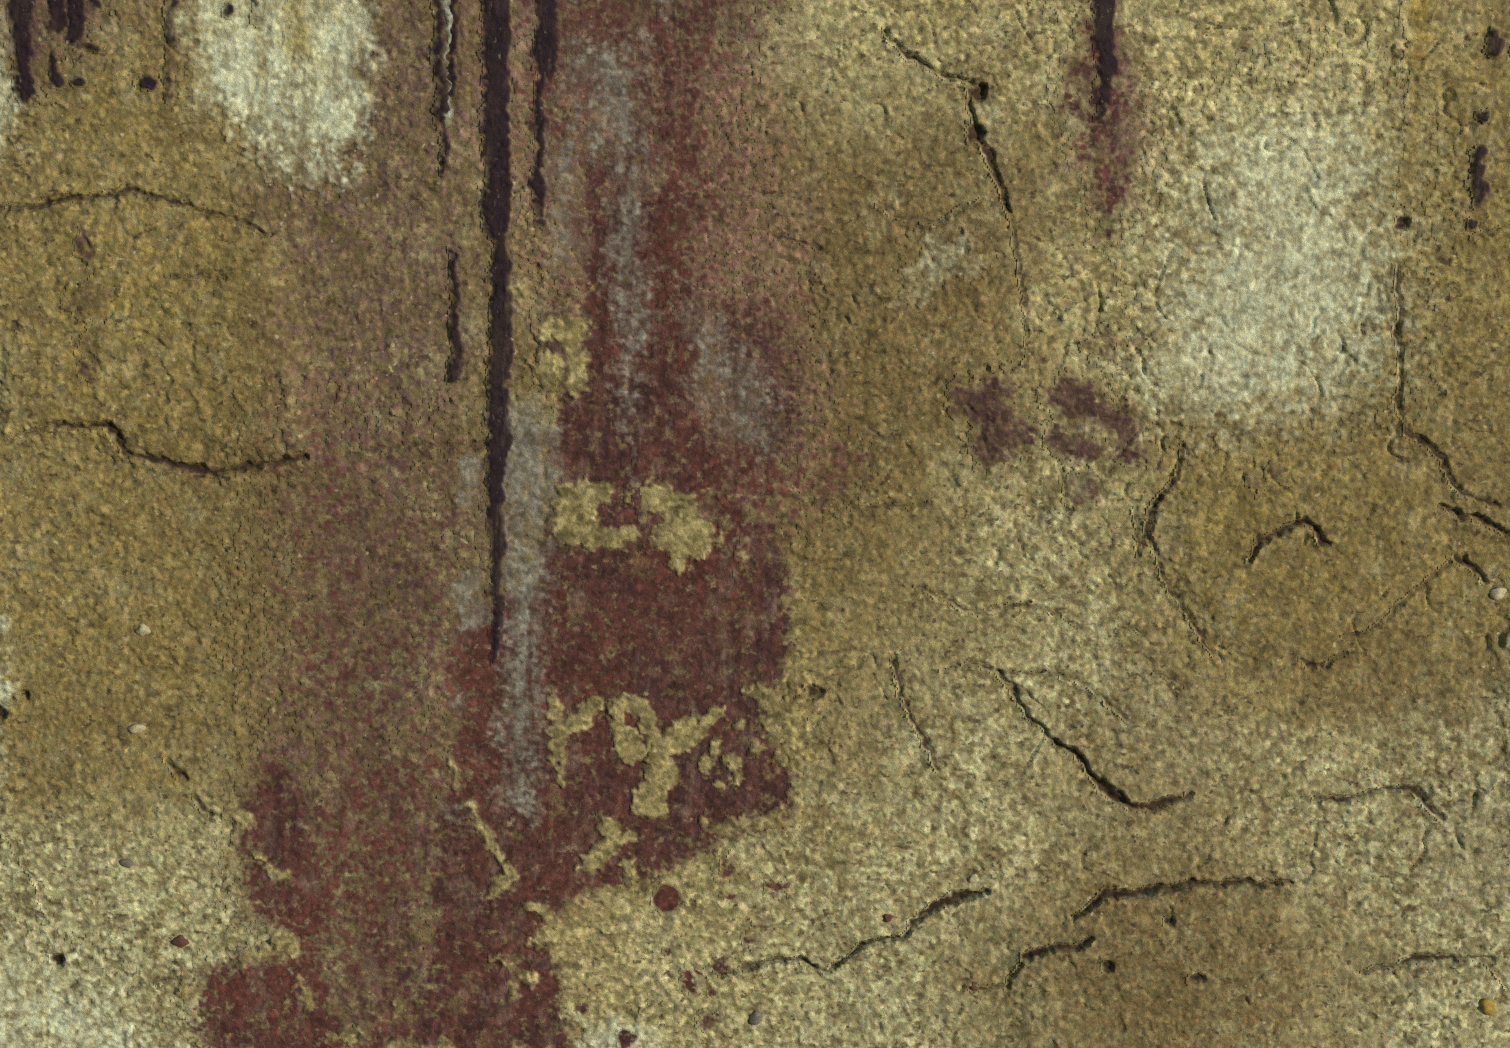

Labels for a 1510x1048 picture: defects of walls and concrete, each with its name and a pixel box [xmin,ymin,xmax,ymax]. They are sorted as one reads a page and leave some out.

water stain [0,0,122,176]
water stain [160,0,395,213]
corrosion [282,0,316,65]
water stain [1086,0,1122,123]
crack [4,184,274,238]
water stain [61,224,124,386]
crack [0,420,310,479]
crack [914,443,1217,690]
crack [1245,516,1332,564]
crack [1298,265,1510,672]
crack [939,660,1196,814]
crack [718,888,991,979]